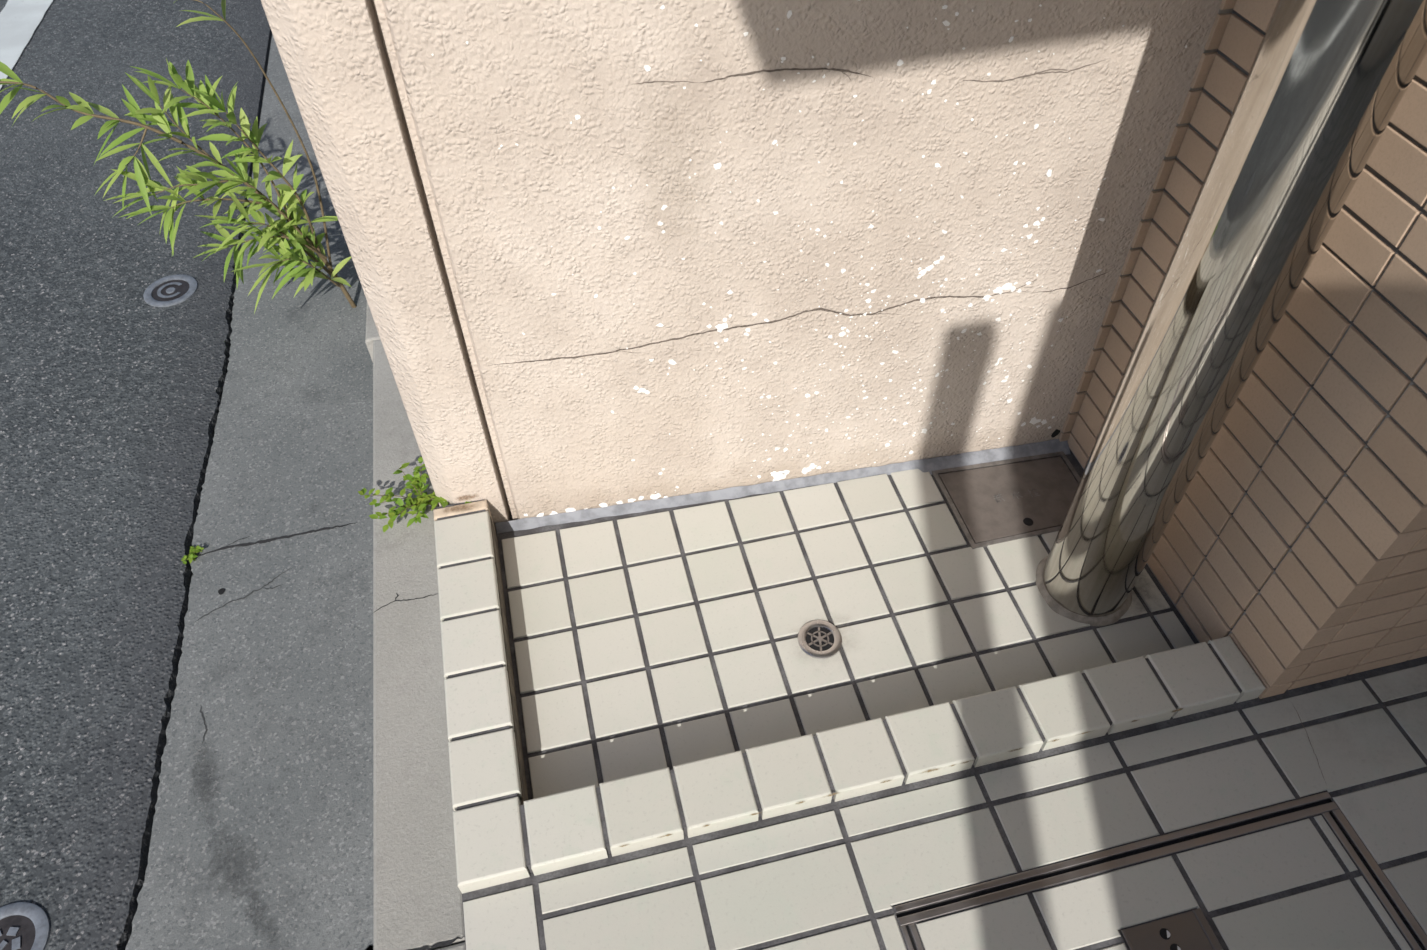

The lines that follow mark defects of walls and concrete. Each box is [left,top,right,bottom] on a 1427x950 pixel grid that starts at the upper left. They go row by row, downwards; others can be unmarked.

crack [636,68,871,84]
crack [964,58,1111,82]
crack [488,273,1106,366]
crack [195,523,355,622]
crack [371,593,436,615]
crack [411,937,463,950]